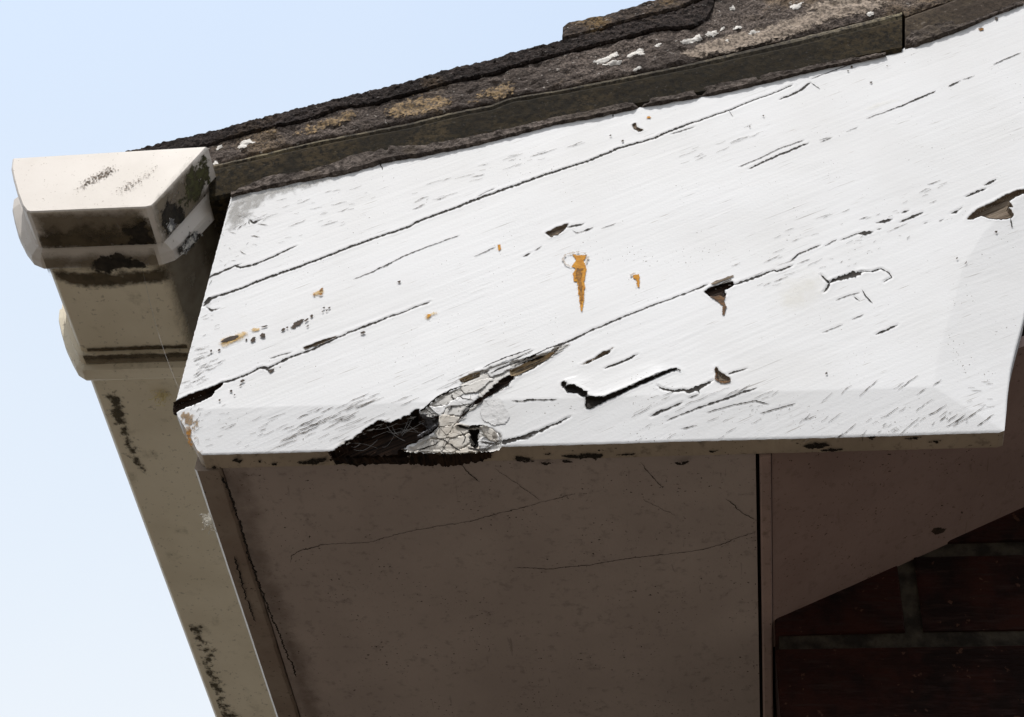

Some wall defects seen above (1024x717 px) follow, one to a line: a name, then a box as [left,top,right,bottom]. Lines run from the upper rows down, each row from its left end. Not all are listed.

peeling [967,189,1024,227]
mould [39,199,203,287]
corrosion [562,251,589,311]
crack [180,64,996,559]
peeling [704,275,734,315]
water stain [106,394,146,471]
peeling [173,383,223,416]
peeling [418,363,513,453]
peeling [514,453,603,465]
peeling [561,347,681,408]
peeling [714,367,731,383]
mould [189,624,237,717]